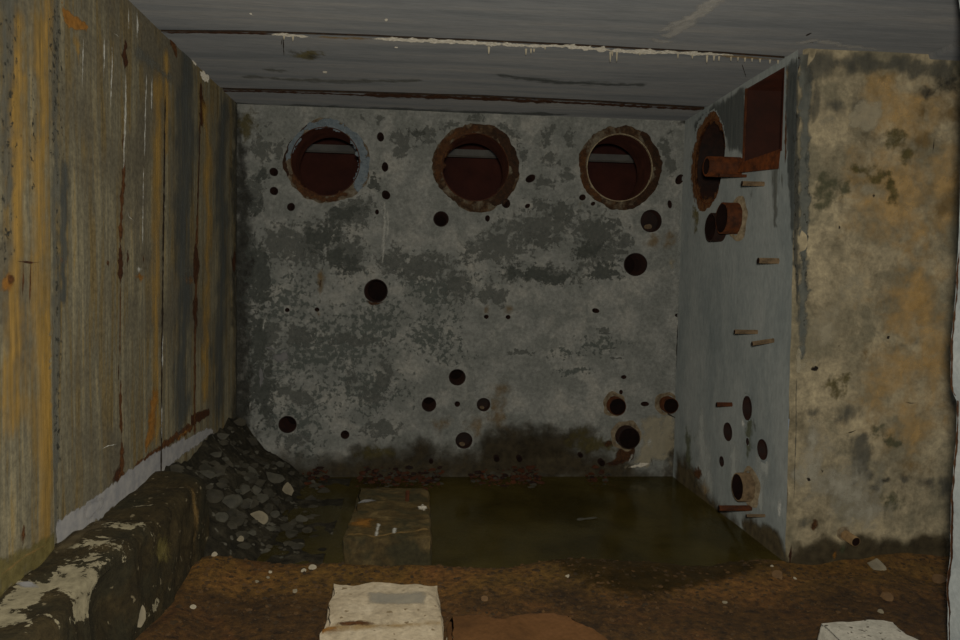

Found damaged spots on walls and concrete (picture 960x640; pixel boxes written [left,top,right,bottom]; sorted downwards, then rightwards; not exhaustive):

corrosion [107,164,129,350]
corrosion [113,55,211,482]
leakage [170,40,193,429]
leakage [271,33,318,59]
leakage [210,102,651,483]
leakage [326,8,956,359]
leakage [551,412,950,591]